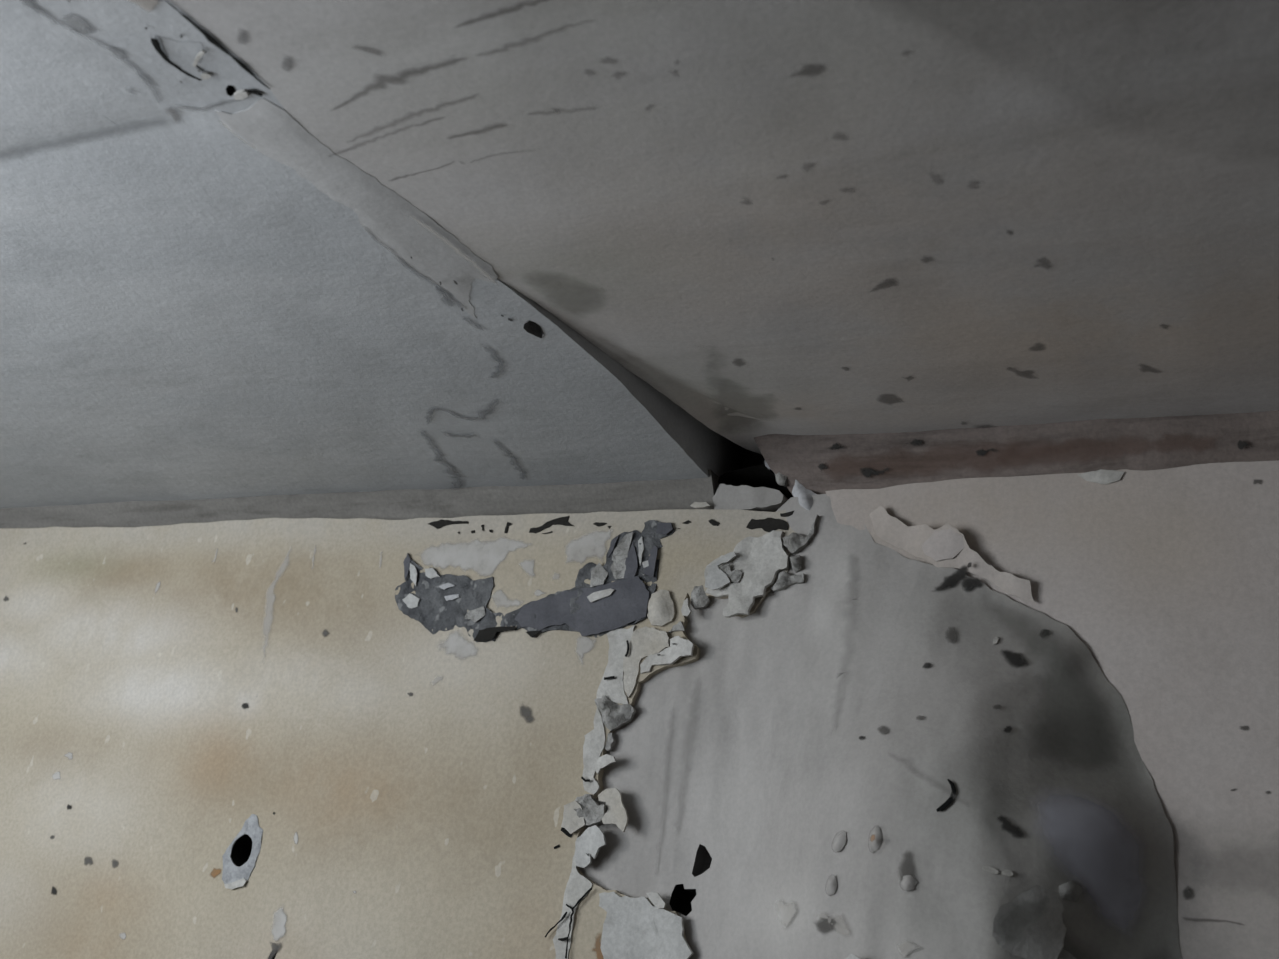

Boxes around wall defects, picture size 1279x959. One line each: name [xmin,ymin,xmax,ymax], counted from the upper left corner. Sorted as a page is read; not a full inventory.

crack [165,0,270,97]
flaking render [704,530,789,618]
spalling [395,520,694,959]
spalling [899,852,913,880]
spalling [816,919,836,932]